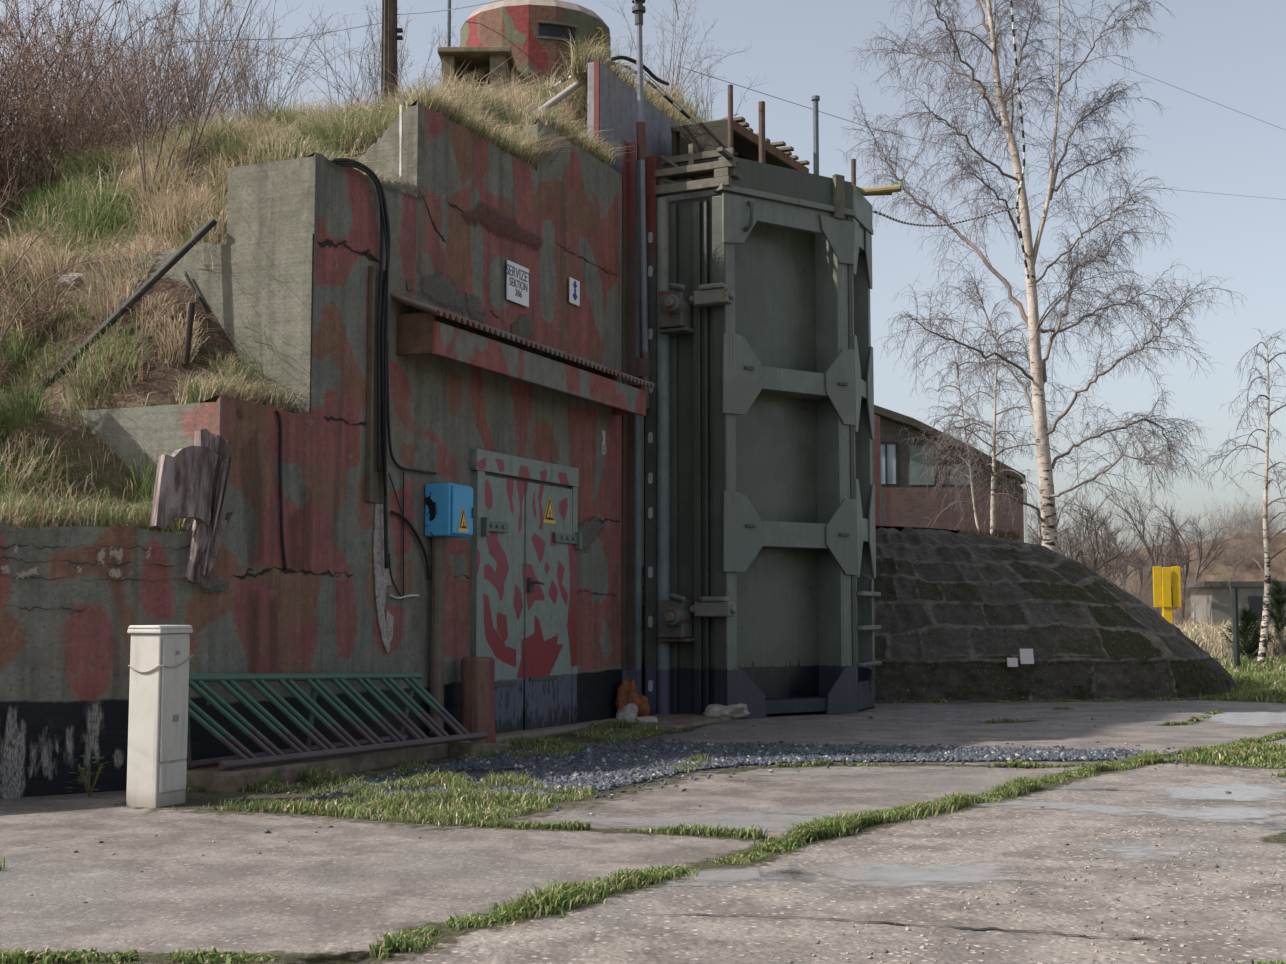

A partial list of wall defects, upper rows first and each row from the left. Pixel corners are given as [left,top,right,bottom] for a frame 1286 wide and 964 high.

crack [422,196,466,242]
crack [317,239,380,263]
crack [556,242,618,277]
peeling [0,544,41,580]
peeling [74,546,124,579]
crack [232,567,355,579]
crack [644,913,1174,940]